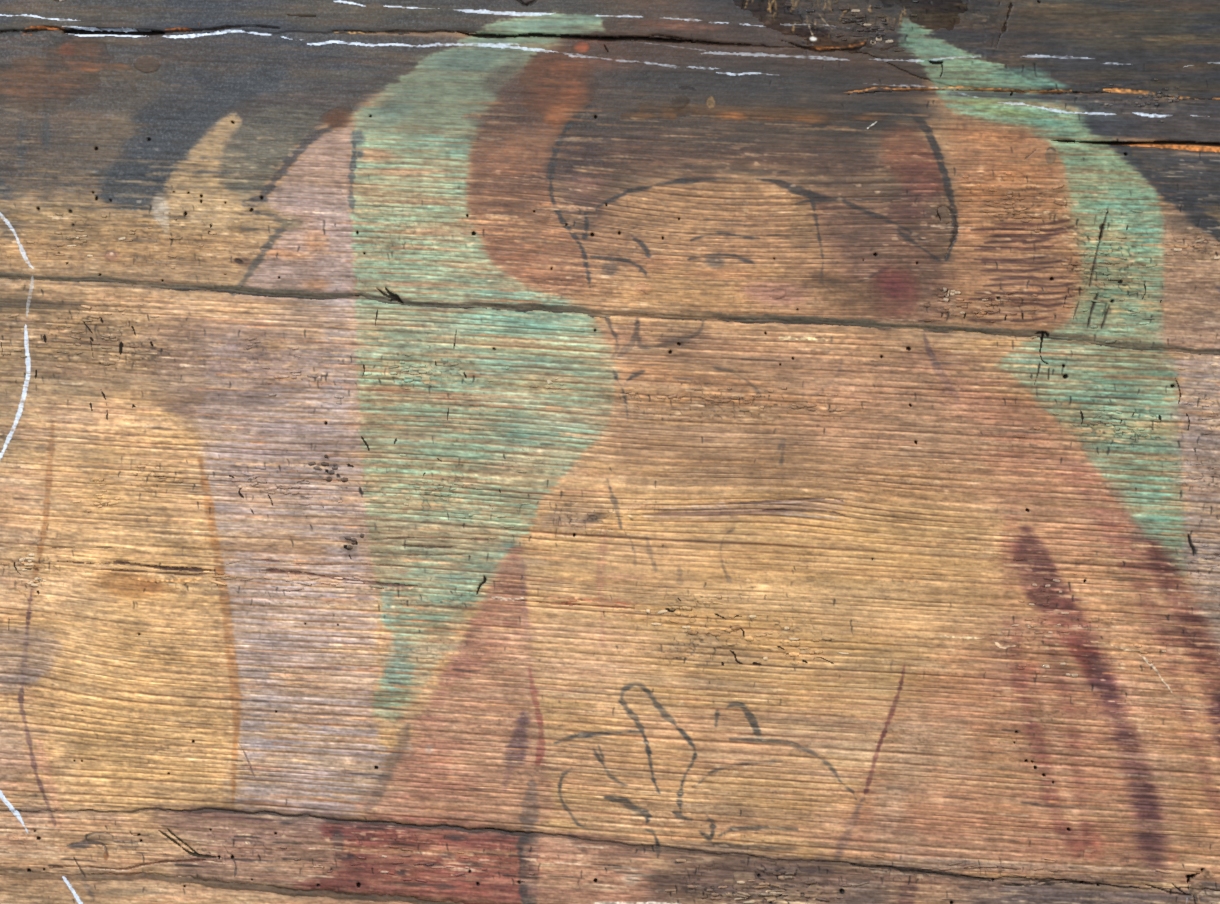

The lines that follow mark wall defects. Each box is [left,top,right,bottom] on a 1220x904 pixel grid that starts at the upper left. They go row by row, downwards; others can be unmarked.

crack [0,14,866,52]
crack [376,287,403,303]
crack [850,863,1093,887]